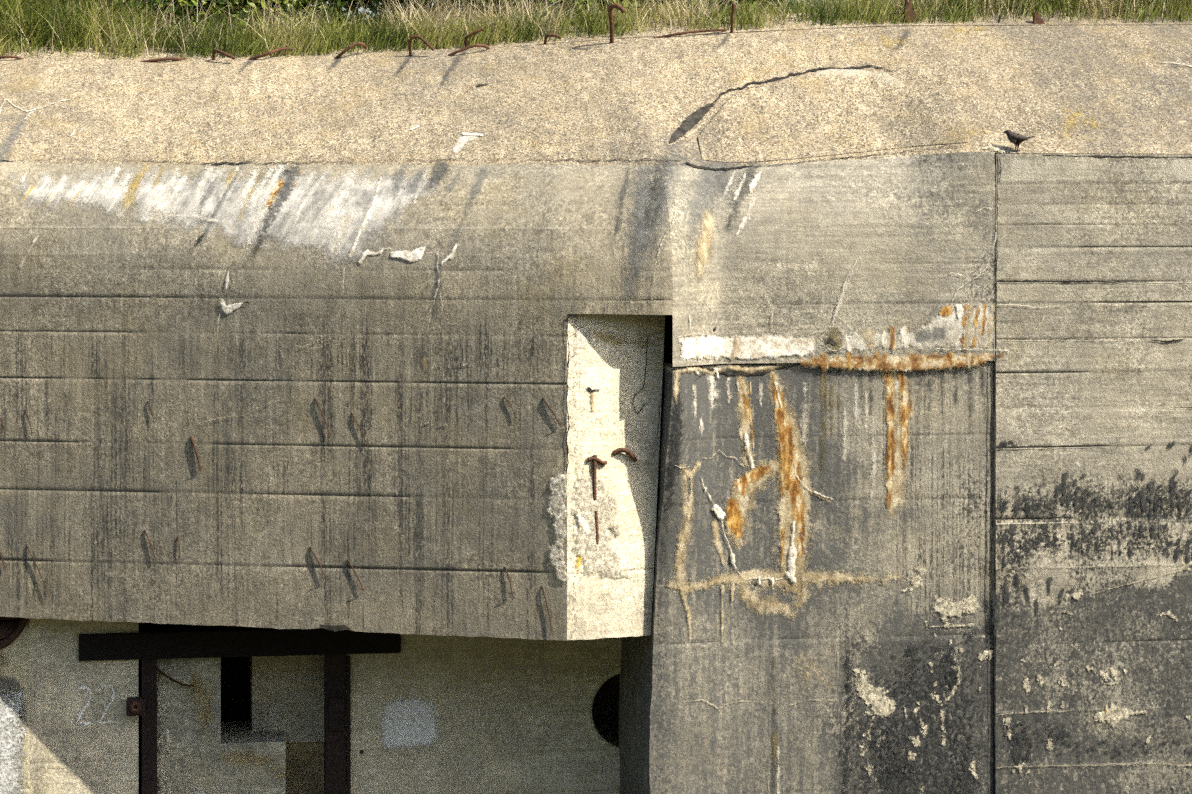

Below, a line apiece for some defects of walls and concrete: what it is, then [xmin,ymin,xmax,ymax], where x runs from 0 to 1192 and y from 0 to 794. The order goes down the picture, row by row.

crack [710,65,893,105]
water stain [10,132,483,261]
spalling [546,448,638,583]
rust [674,470,693,586]
rust [726,371,861,594]
rust [800,328,1009,518]
water stain [839,631,993,794]
water stain [999,717,1192,768]